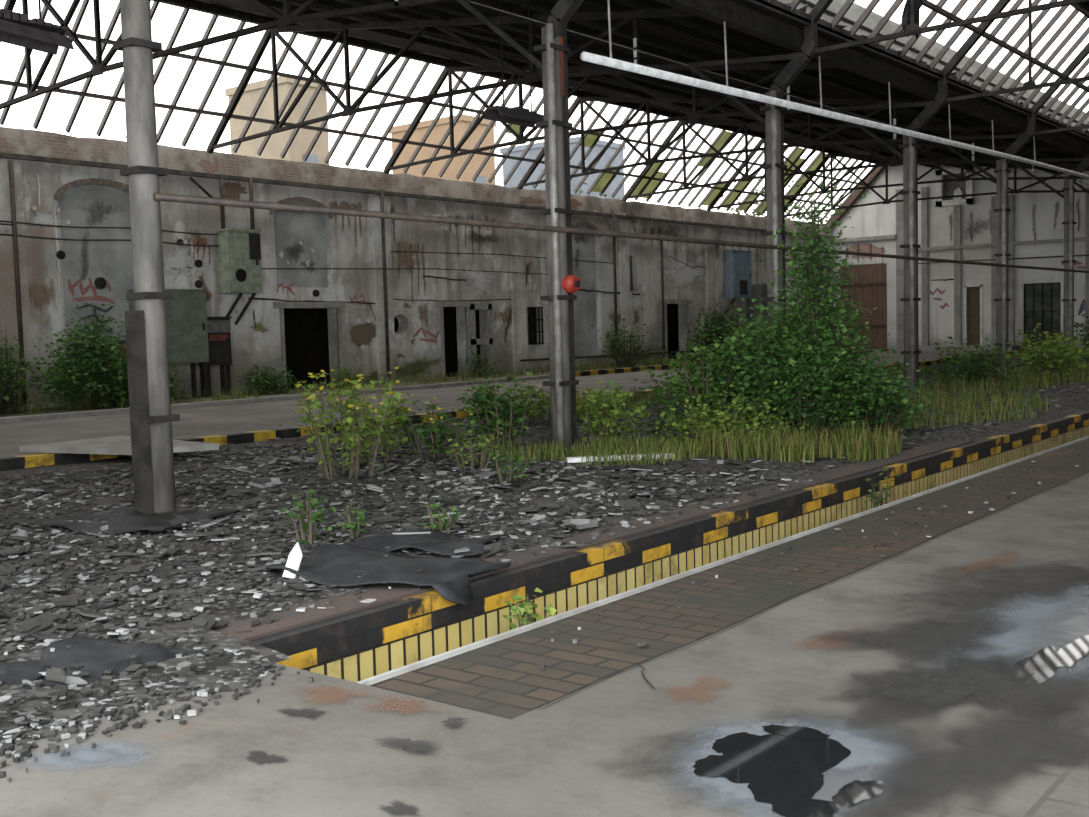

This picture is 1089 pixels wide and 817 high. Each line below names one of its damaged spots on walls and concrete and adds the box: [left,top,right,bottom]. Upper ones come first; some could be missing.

peeling [28,284,54,307]
spalling [350,317,376,351]
damp [843,616,1089,793]